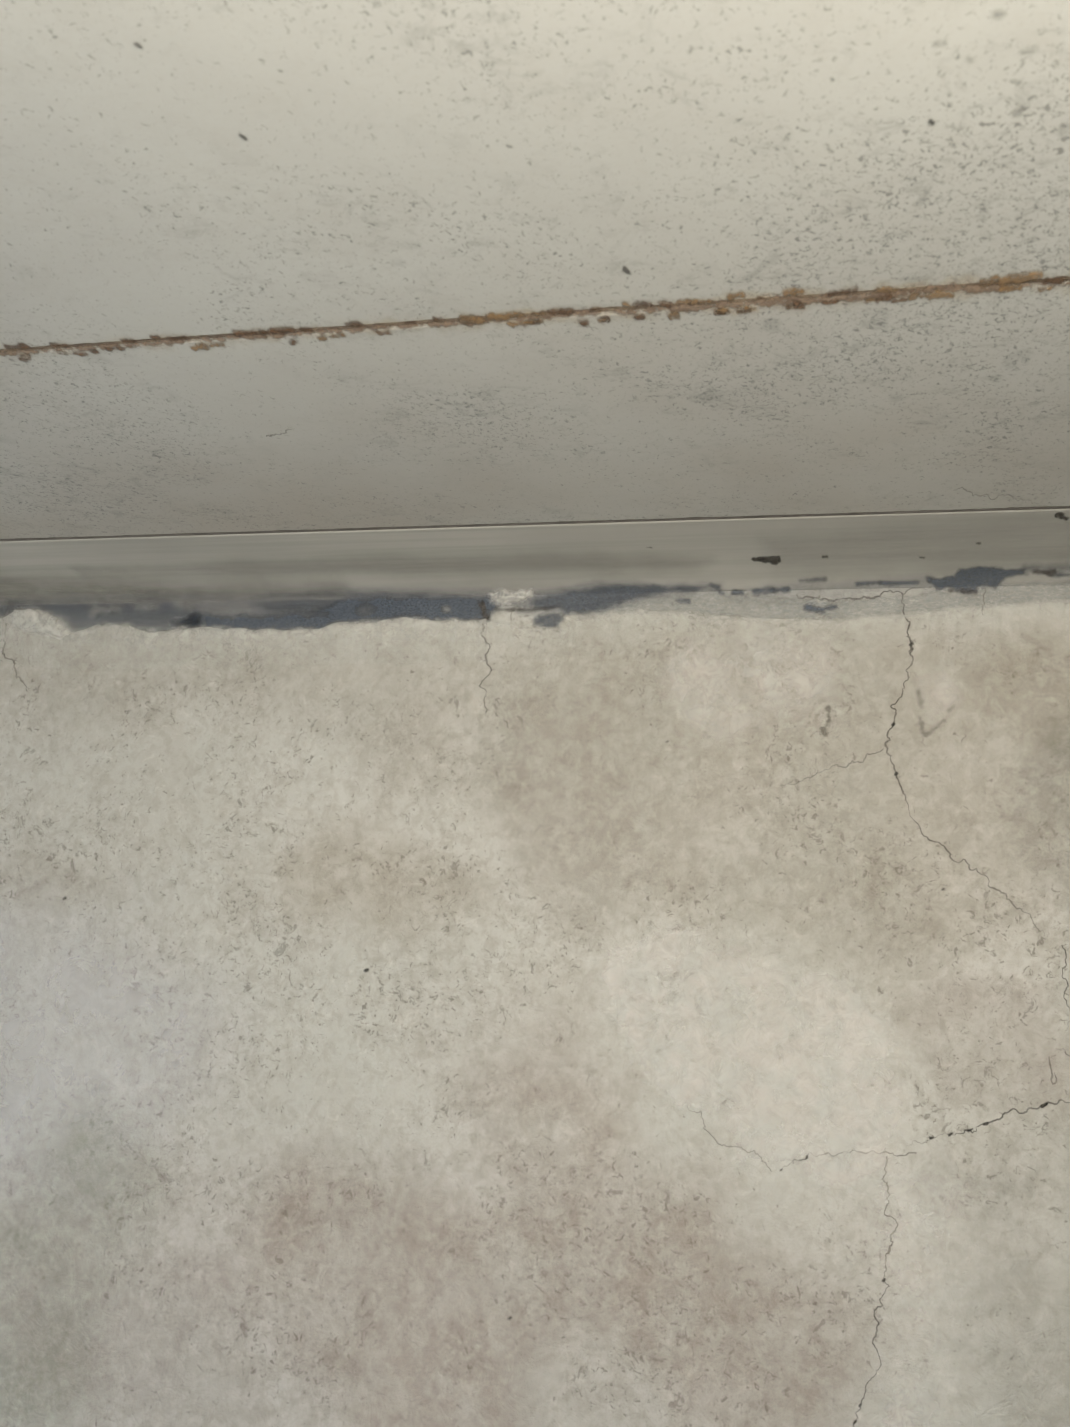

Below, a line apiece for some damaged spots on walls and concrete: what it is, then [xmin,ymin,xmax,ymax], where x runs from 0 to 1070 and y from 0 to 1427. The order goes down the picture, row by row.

corrosion [0,272,1070,362]
spalling [752,556,781,565]
peeling [492,590,532,603]
peeling [367,617,442,629]
peeling [182,624,334,638]
crack [808,588,993,888]
crack [854,1058,1061,1424]